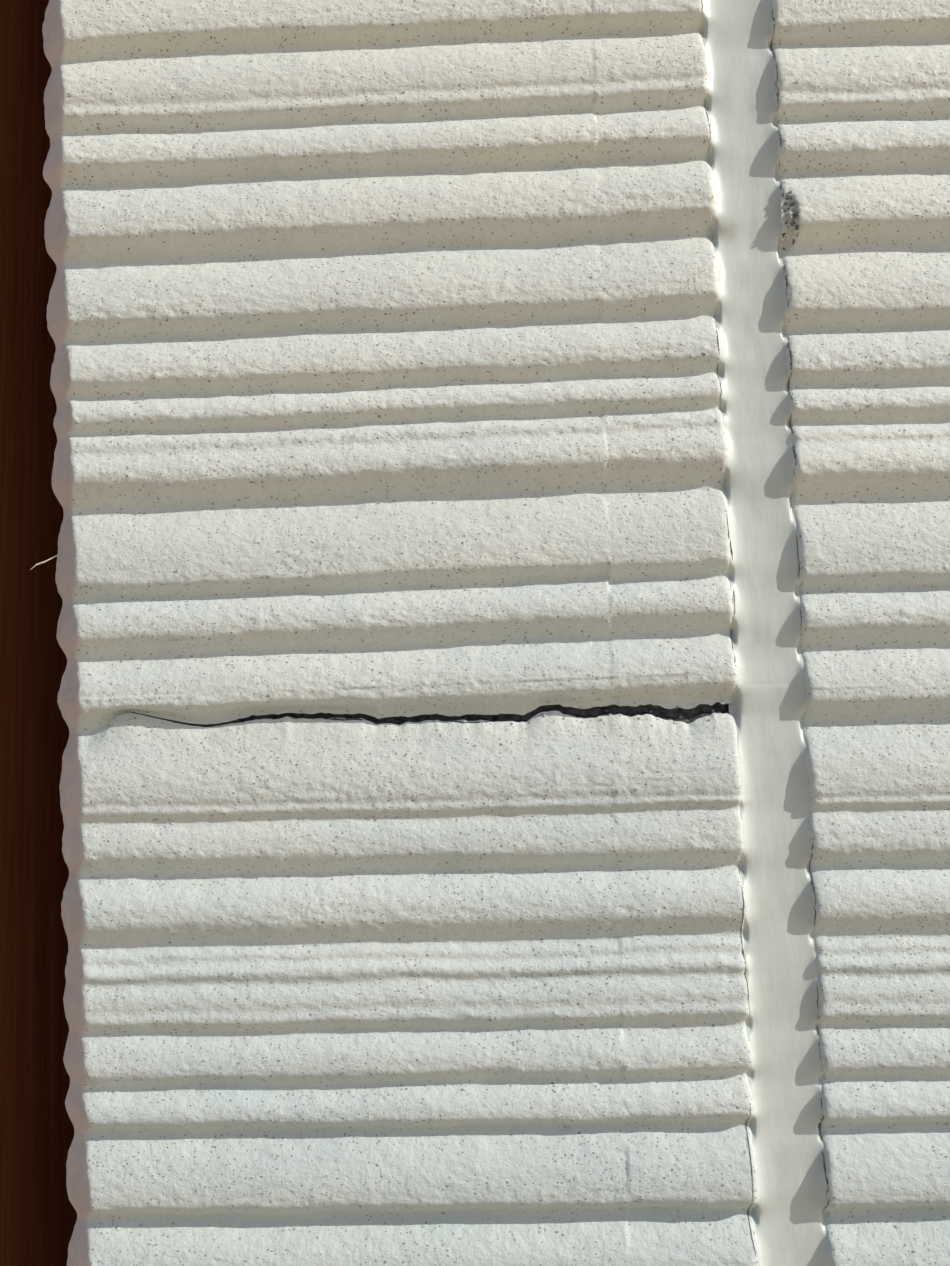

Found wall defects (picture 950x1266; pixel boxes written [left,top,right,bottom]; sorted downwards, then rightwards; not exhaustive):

crack [121,700,731,727]